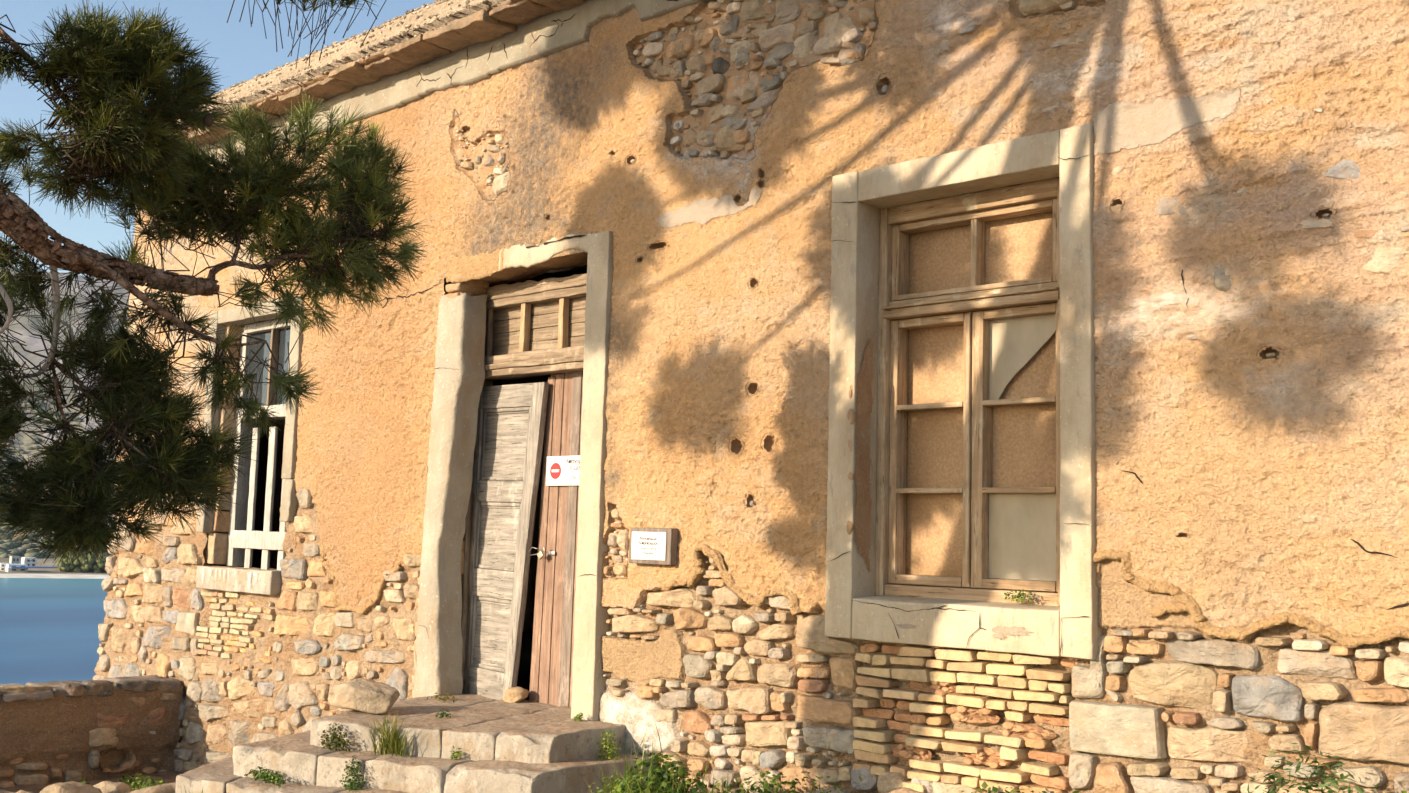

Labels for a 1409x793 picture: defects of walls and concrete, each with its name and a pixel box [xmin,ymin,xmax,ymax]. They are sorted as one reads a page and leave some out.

flaking render [1008,0,1105,18]
flaking render [626,0,879,161]
flaking render [318,541,403,614]
flaking render [661,543,803,615]
crack [851,600,986,648]
flaking render [1093,549,1409,648]
spalling [891,743,935,762]
spalling [908,681,1057,769]